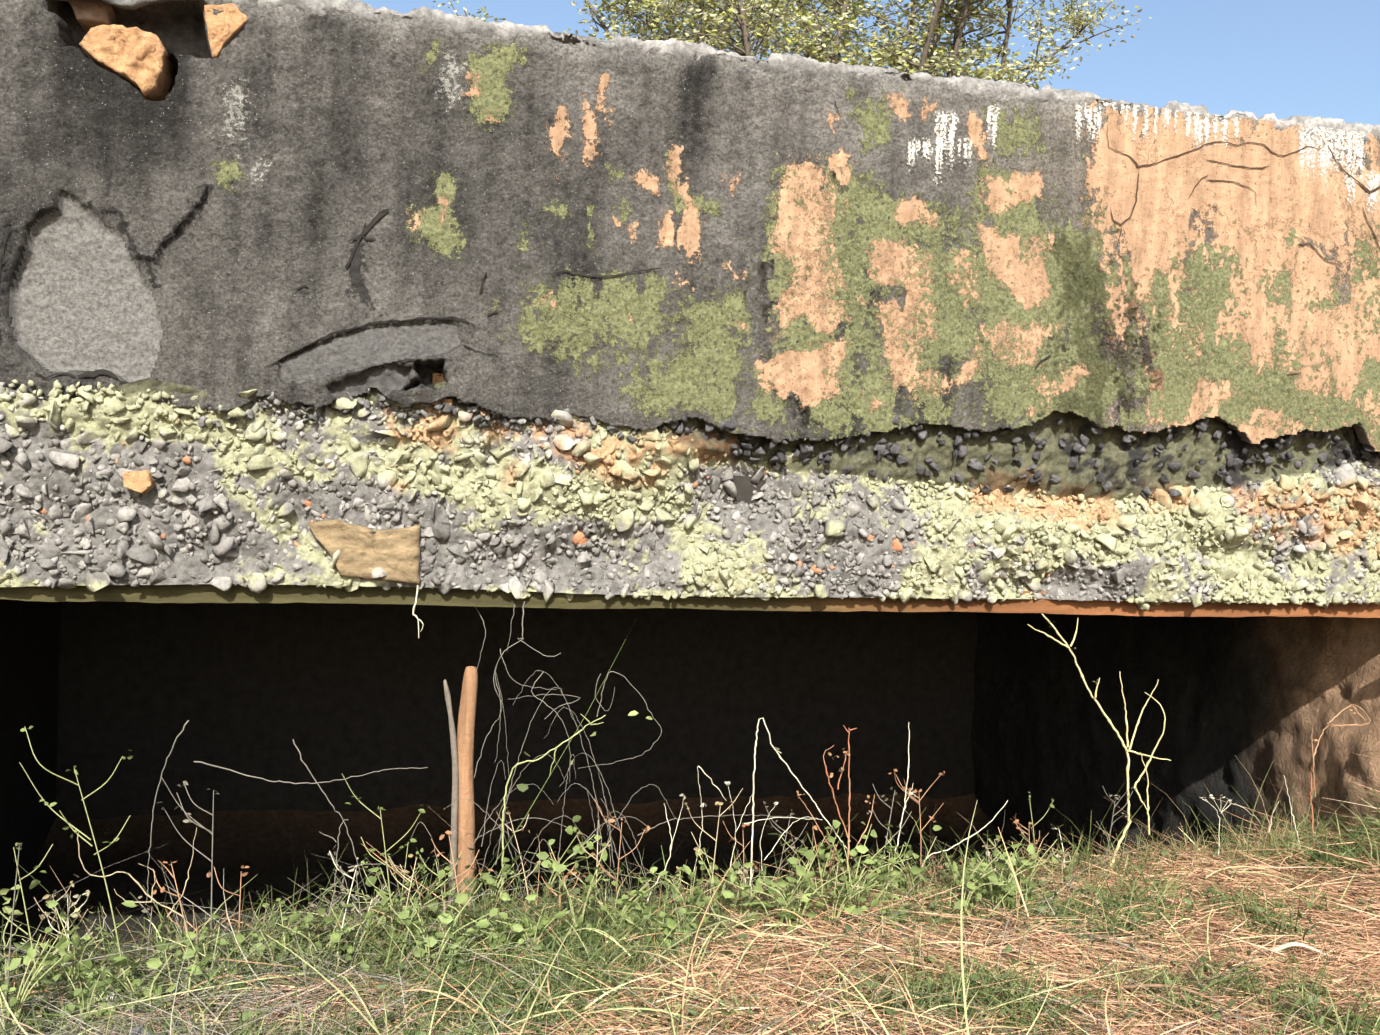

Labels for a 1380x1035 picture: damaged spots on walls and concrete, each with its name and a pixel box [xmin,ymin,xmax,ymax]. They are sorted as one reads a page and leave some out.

spalling [49,0,247,101]
flaking render [462,71,501,123]
flaking render [545,73,616,175]
flaking render [886,92,938,122]
damp [907,104,1001,191]
damp [1075,101,1241,151]
crack [1107,125,1380,248]
damp [1296,126,1380,213]
crack [345,209,389,268]
crack [1298,243,1337,265]
crack [264,272,499,367]
spalling [0,101,1380,610]